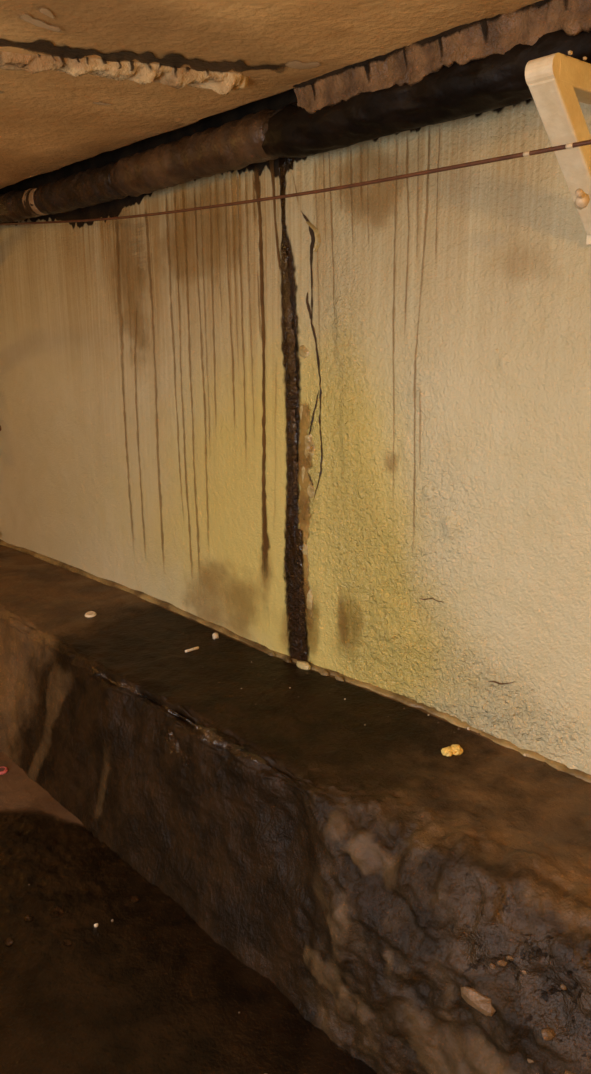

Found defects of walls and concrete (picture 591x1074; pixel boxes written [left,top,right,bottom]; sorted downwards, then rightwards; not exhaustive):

spalling [0,51,249,95]
spalling [293,0,591,114]
leakage [9,192,153,247]
leakage [0,89,297,194]
leakage [396,127,430,244]
crack [295,187,323,496]
leakage [221,157,309,662]
leakage [178,441,208,555]